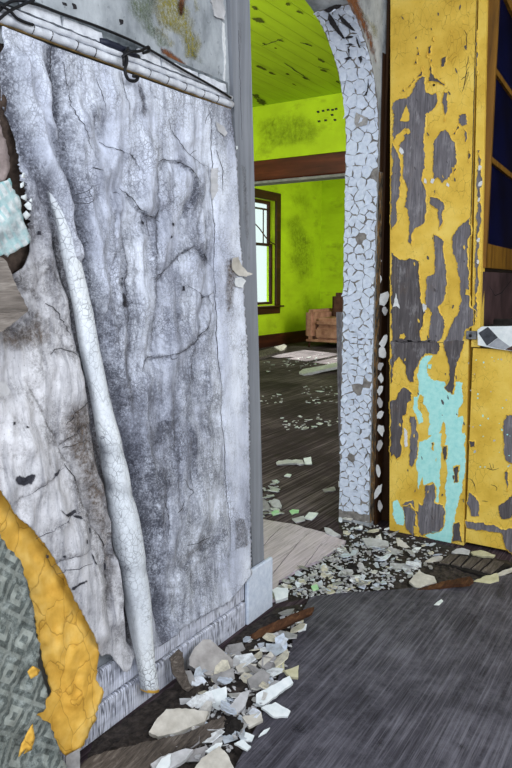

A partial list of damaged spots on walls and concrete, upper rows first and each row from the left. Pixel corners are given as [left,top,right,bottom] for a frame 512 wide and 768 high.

crack [148,68,224,191]
peeling [20,173,32,220]
crack [143,205,222,384]
crack [285,3,379,523]
peeling [377,28,512,554]
crack [25,400,91,497]
peeling [374,465,383,511]